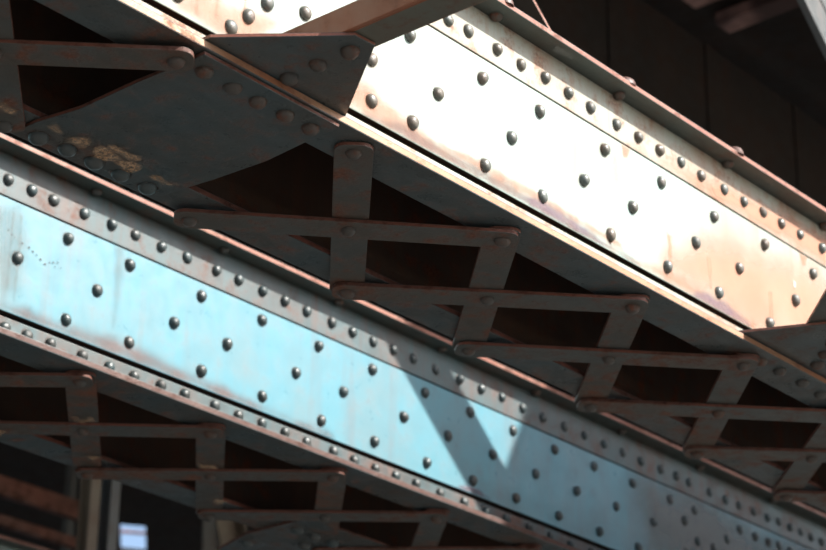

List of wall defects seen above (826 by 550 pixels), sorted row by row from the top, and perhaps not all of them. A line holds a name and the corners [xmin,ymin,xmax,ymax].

corrosion [190,0,262,34]
corrosion [353,88,434,150]
corrosion [71,138,139,171]
corrosion [713,188,826,263]
corrosion [668,235,824,327]